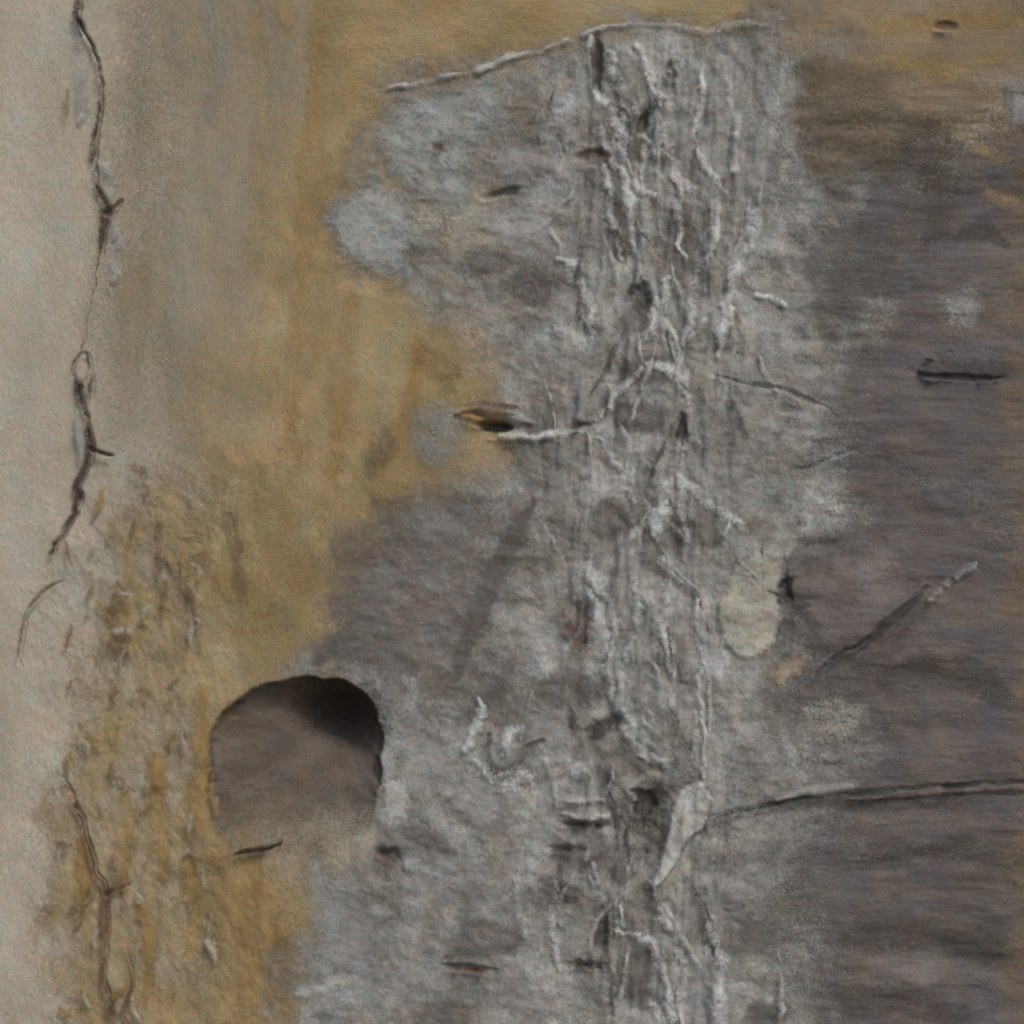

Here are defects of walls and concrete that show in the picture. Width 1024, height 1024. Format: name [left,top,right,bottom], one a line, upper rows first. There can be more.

crack [48,0,122,557]
crack [61,760,133,1024]
water stain [58,0,740,1024]
spalling [244,0,922,1024]
water stain [512,31,1024,1024]
crack [705,780,1024,822]
crack [814,585,929,676]
crack [918,358,1007,382]